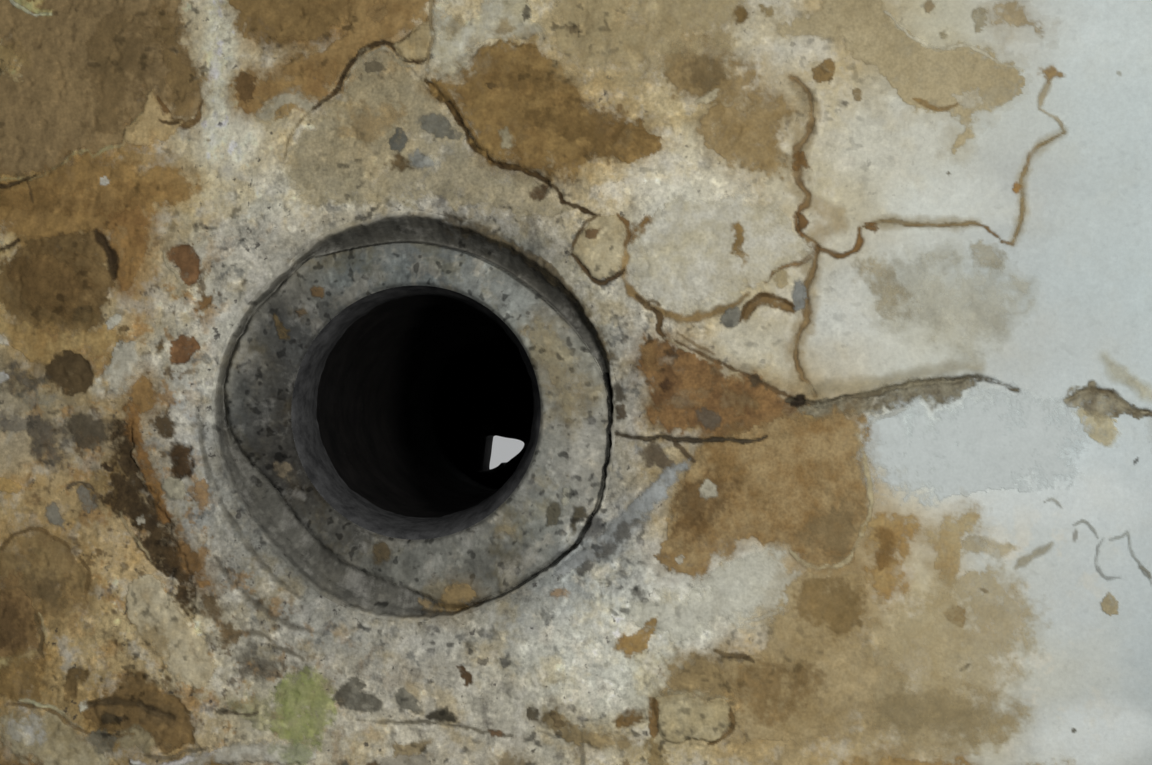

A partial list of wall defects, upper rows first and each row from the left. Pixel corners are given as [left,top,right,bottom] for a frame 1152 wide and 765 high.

water stain [0,0,207,180]
crack [288,0,596,216]
water stain [426,0,748,84]
water stain [760,0,1025,154]
crack [636,67,1064,418]
water stain [0,527,94,671]
water stain [553,463,688,577]
crack [615,432,767,468]
water stain [626,548,802,641]
water stain [868,570,1032,756]